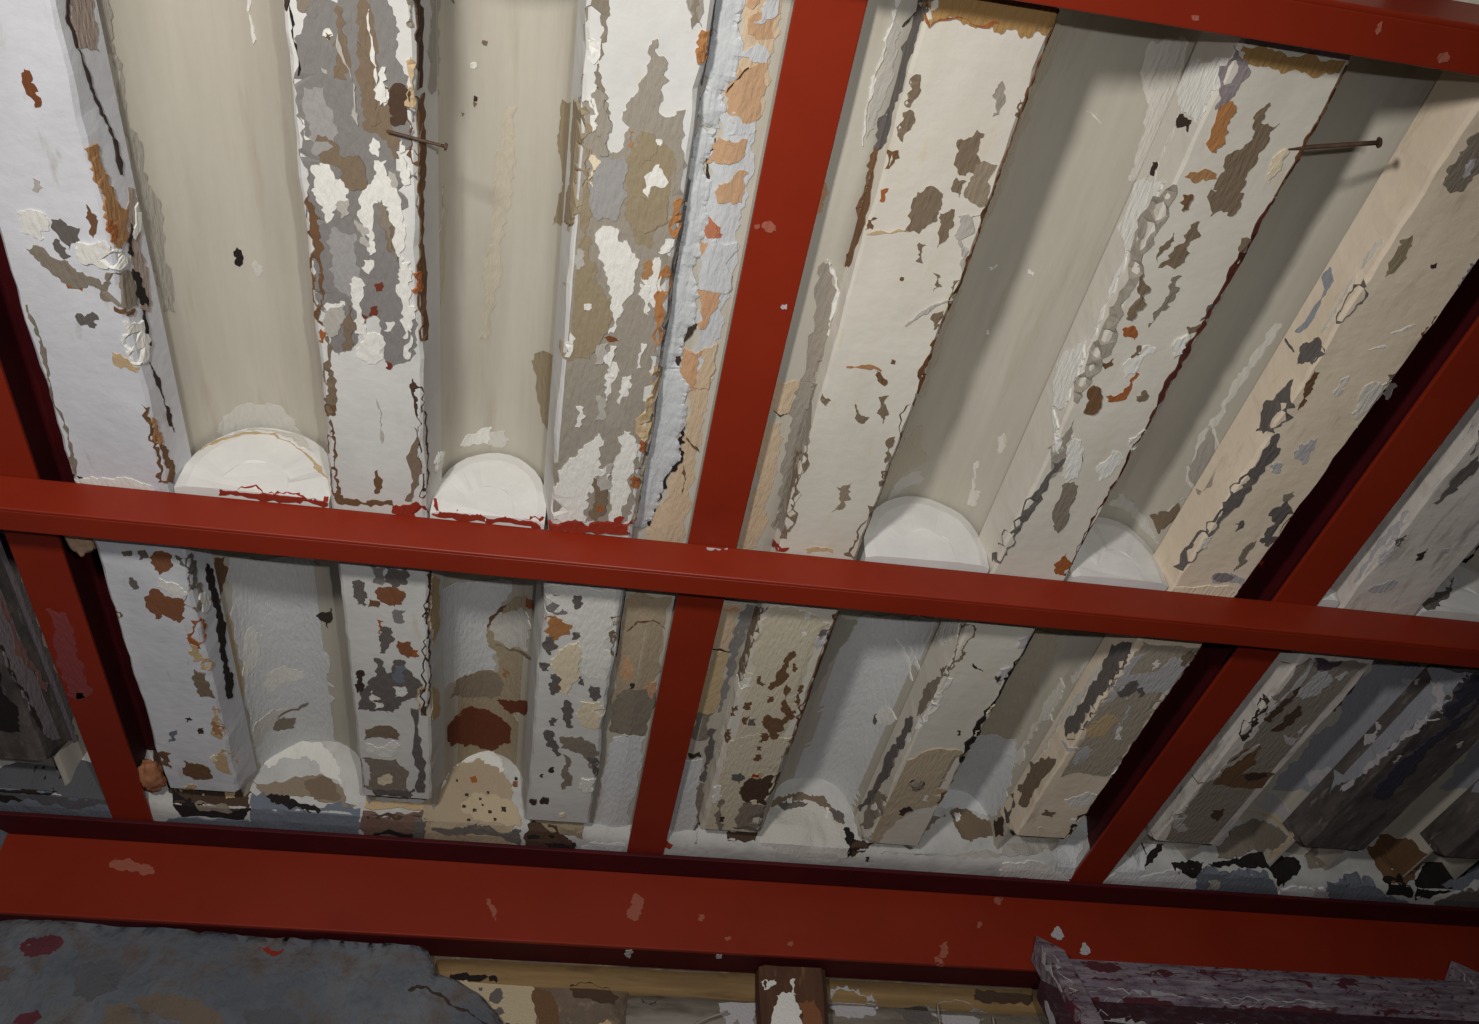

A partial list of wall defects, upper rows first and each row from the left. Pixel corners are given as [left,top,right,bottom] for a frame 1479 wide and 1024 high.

peeling [16,143,152,372]
peeling [142,406,176,483]
peeling [293,0,430,502]
peeling [531,0,687,524]
peeling [646,289,721,543]
peeling [699,0,1057,559]
peeling [992,15,1346,571]
peeling [1443,132,1479,193]
spalling [122,550,672,852]
peeling [688,604,1097,857]
spalling [1213,658,1365,789]
spalling [1138,805,1479,908]